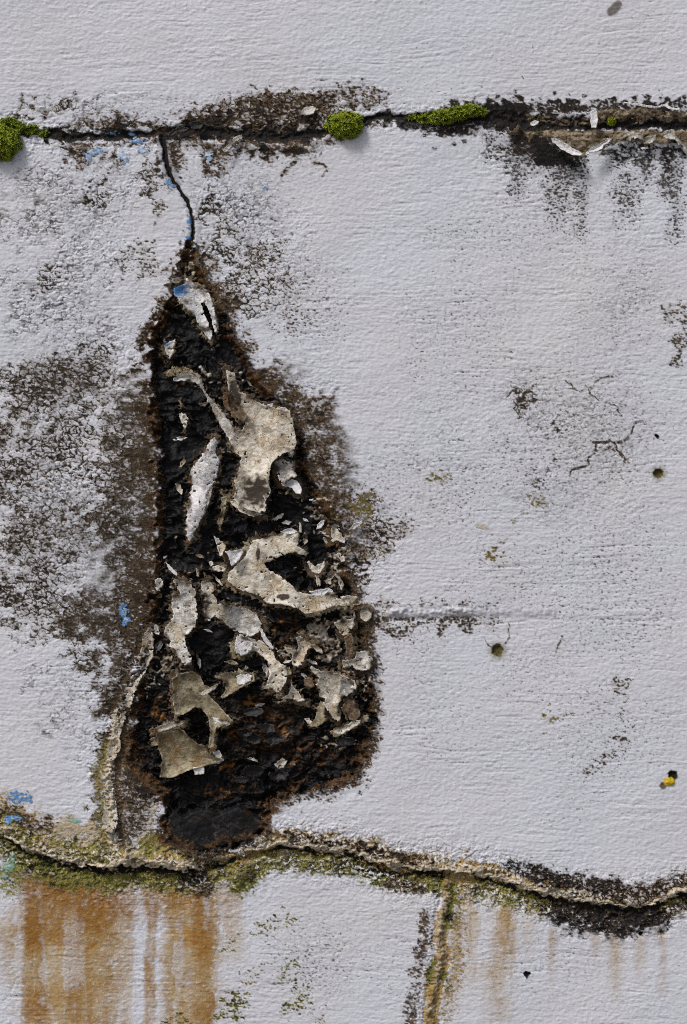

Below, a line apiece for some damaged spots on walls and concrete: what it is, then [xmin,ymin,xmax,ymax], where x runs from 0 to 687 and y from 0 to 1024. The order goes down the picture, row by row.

crack [15,105,344,255]
crack [360,109,687,132]
water stain [423,90,687,245]
water stain [12,78,503,656]
water stain [0,296,181,852]
peeling [119,214,382,861]
water stain [277,668,385,812]
crack [0,627,687,1024]
corrosion [6,878,215,1024]